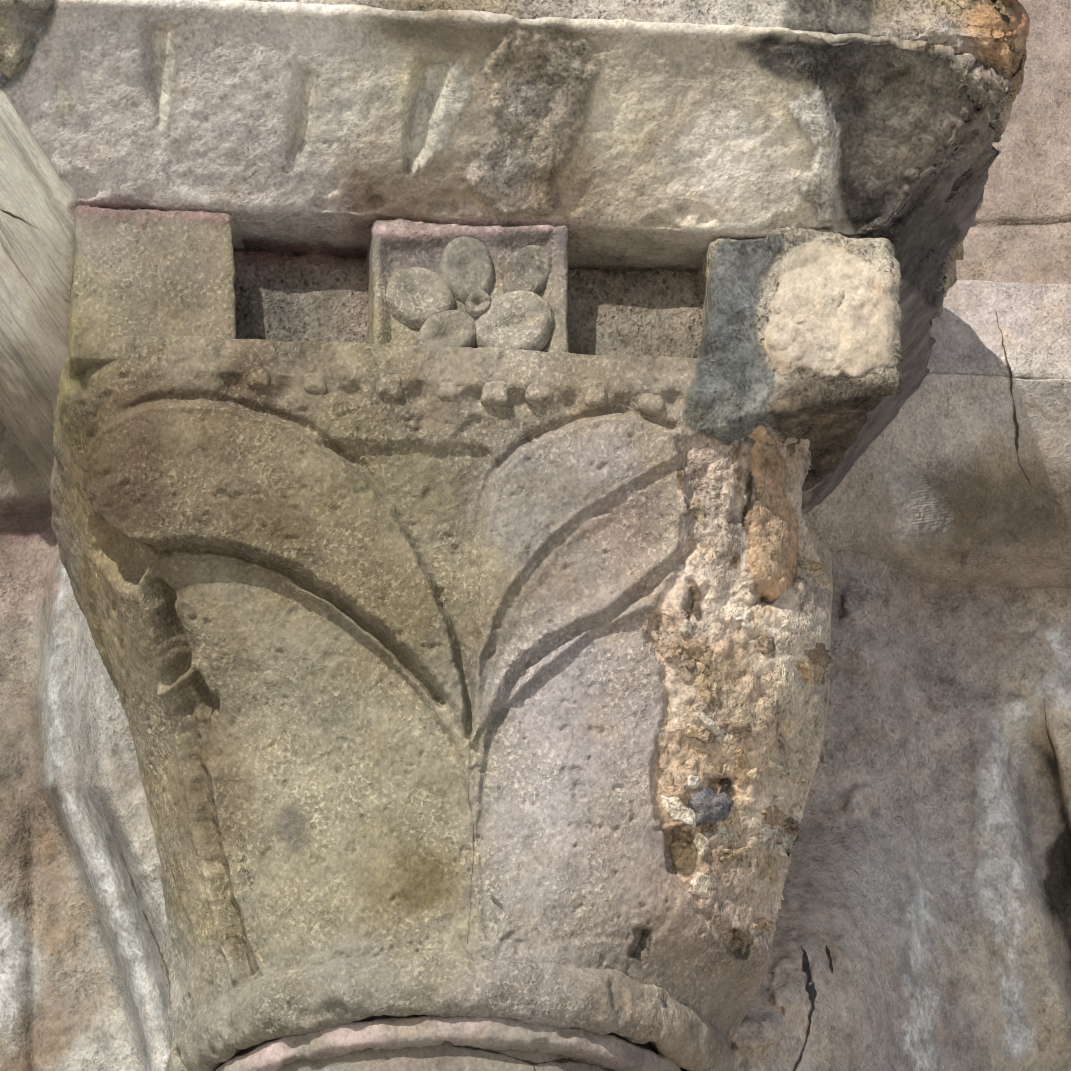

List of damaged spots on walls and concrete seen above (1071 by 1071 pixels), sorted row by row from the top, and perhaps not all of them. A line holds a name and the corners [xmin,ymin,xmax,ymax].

spalling [956,0,1028,55]
crack [0,209,37,229]
damp [685,233,782,446]
crack [995,311,1031,486]
damp [885,461,1071,546]
spalling [642,425,833,960]
spalling [633,930,651,966]
crack [793,945,833,1071]
crack [452,1045,614,1071]